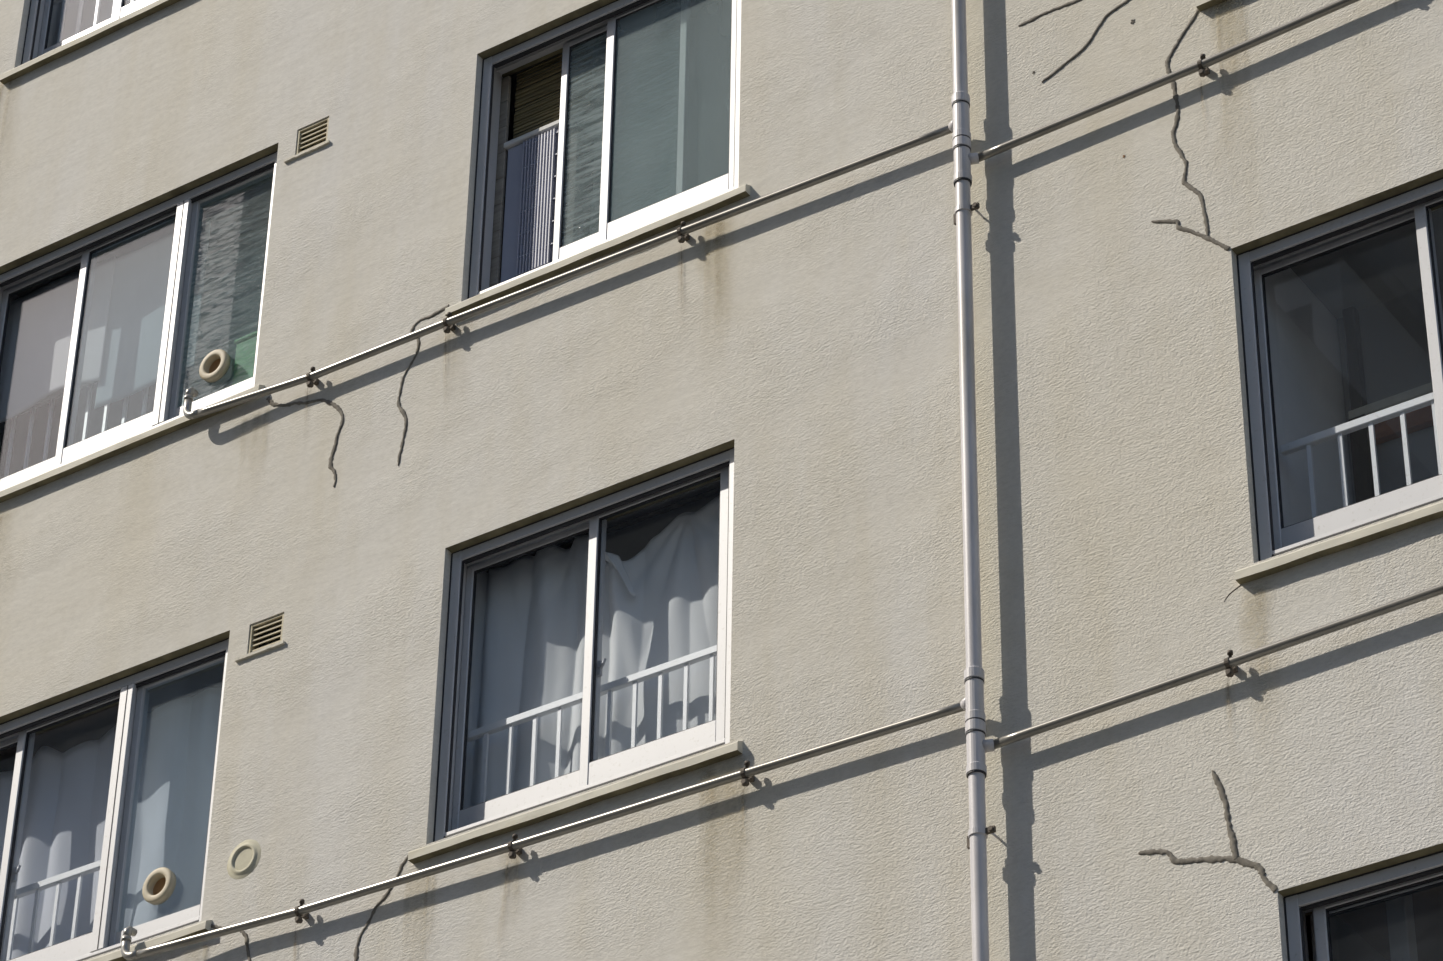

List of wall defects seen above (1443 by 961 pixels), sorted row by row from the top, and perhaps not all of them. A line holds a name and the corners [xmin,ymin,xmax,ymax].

crack [1018,0,1130,83]
crack [1151,9,1231,251]
crack [266,396,344,487]
crack [397,304,449,466]
crack [1138,770,1278,893]
crack [353,855,408,961]